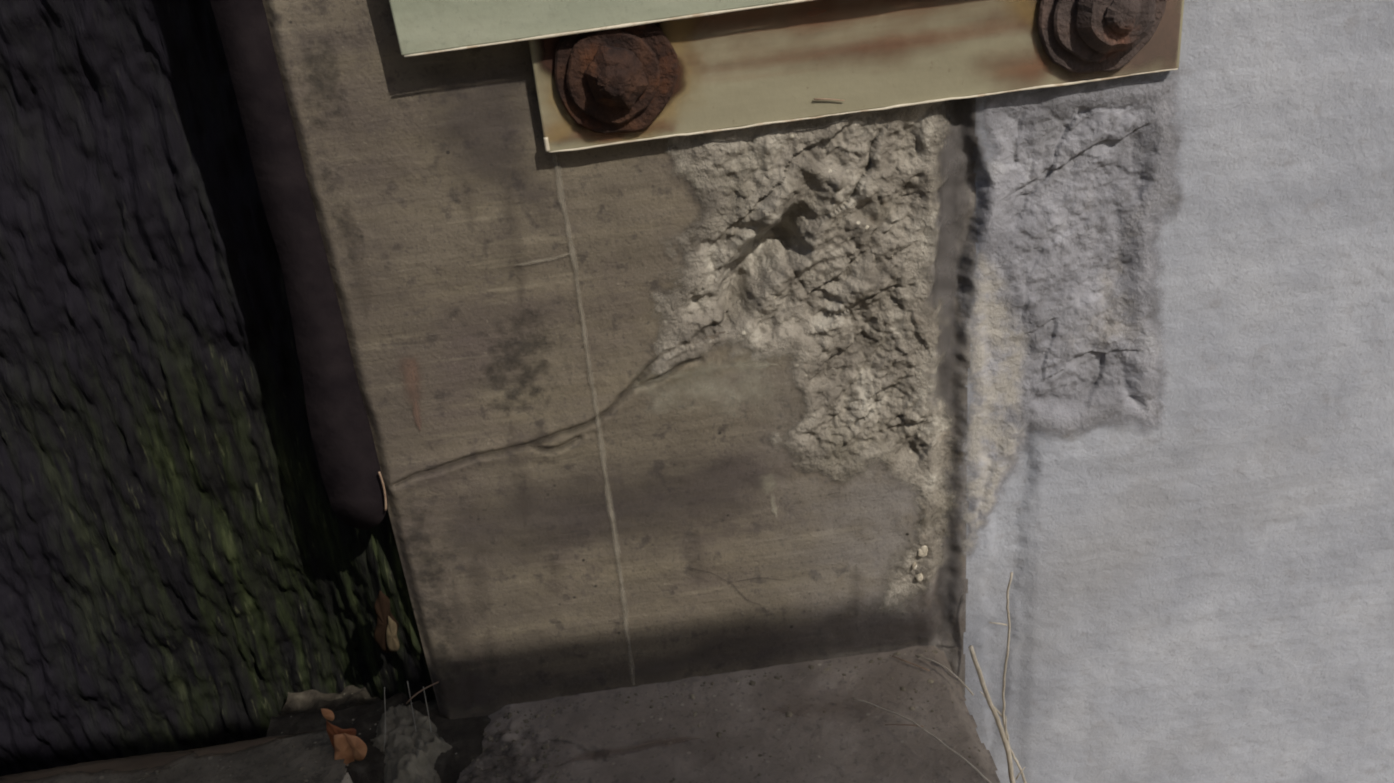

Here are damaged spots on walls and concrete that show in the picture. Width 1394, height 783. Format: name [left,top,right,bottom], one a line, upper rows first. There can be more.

corrosion [539,36,563,75]
corrosion [576,0,934,139]
corrosion [1071,0,1182,78]
spalling [650,75,1182,611]